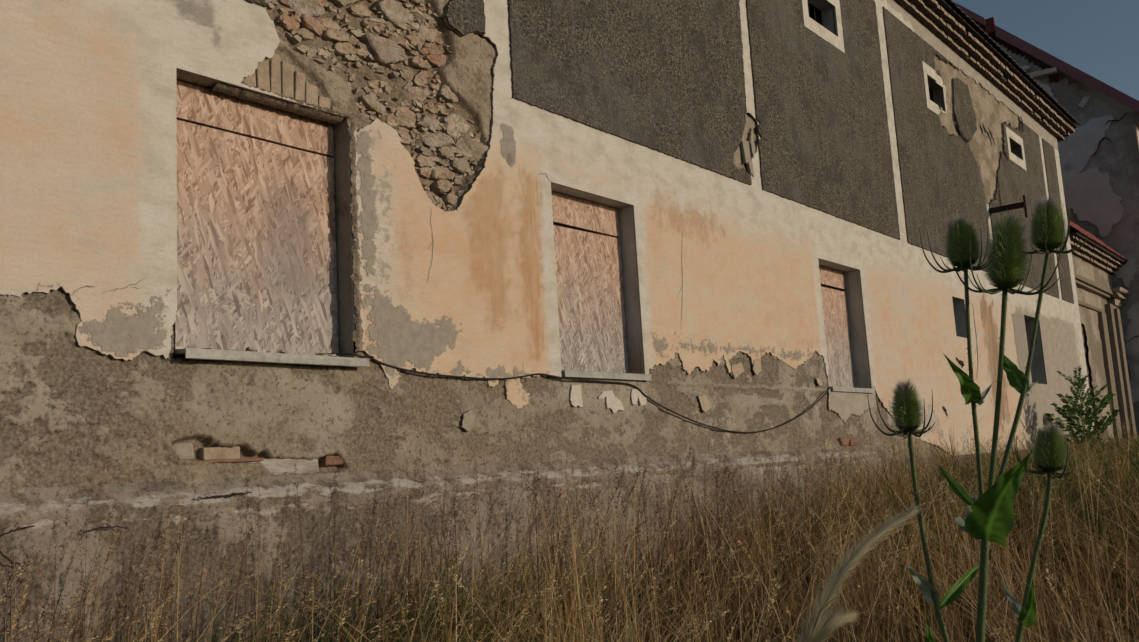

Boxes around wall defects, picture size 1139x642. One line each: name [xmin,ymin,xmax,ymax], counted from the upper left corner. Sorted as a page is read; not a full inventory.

damp [500,123,516,166]
flaking render [934,56,1019,205]
peeling [1057,96,1124,237]
damp [356,130,529,385]
flaking render [0,0,950,493]
peeling [1124,304,1139,403]
crack [0,525,34,566]